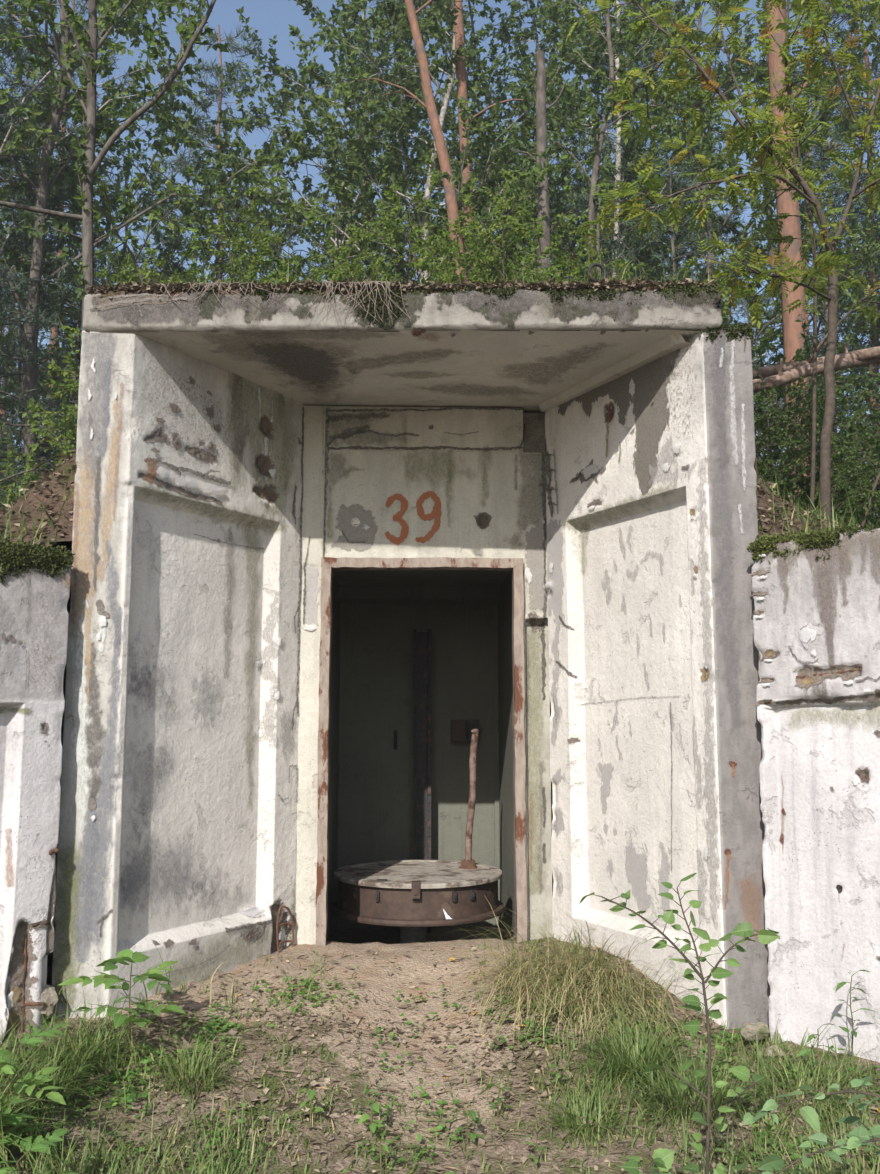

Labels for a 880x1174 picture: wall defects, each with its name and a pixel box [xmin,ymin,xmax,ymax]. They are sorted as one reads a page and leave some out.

spalling [139,368,228,505]
spalling [253,415,279,505]
corrosion [604,402,614,458]
spalling [331,504,378,552]
damp [71,291,288,962]
flaking render [557,340,719,917]
spalling [758,649,780,662]
spalling [755,663,880,709]
damp [764,529,880,668]
flaking render [551,807,565,835]
spalling [0,844,60,1041]